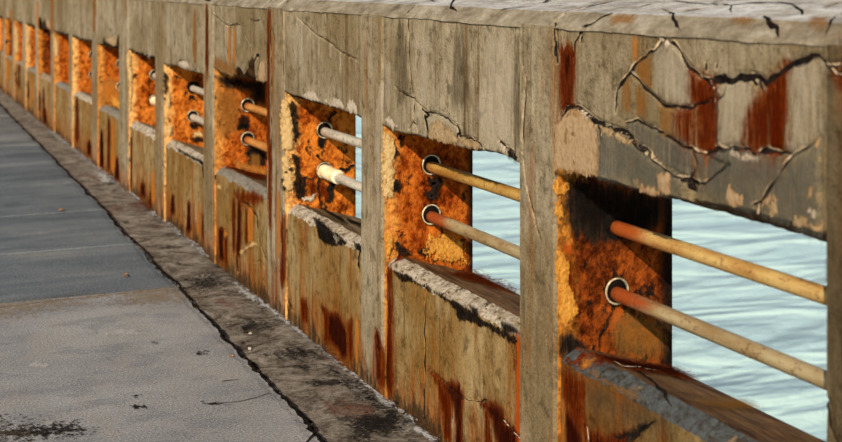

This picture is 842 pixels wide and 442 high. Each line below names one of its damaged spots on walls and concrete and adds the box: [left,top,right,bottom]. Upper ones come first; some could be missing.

corrosion [218,7,286,289]
crack [206,0,357,269]
crack [396,8,541,239]
spalling [553,108,635,219]
spalling [633,172,671,196]
crack [560,0,842,215]
spalling [725,183,743,208]
corrosion [740,59,791,166]
crack [0,105,325,442]
peeling [554,244,581,328]
corrosion [480,334,520,442]
corrosion [560,347,699,442]